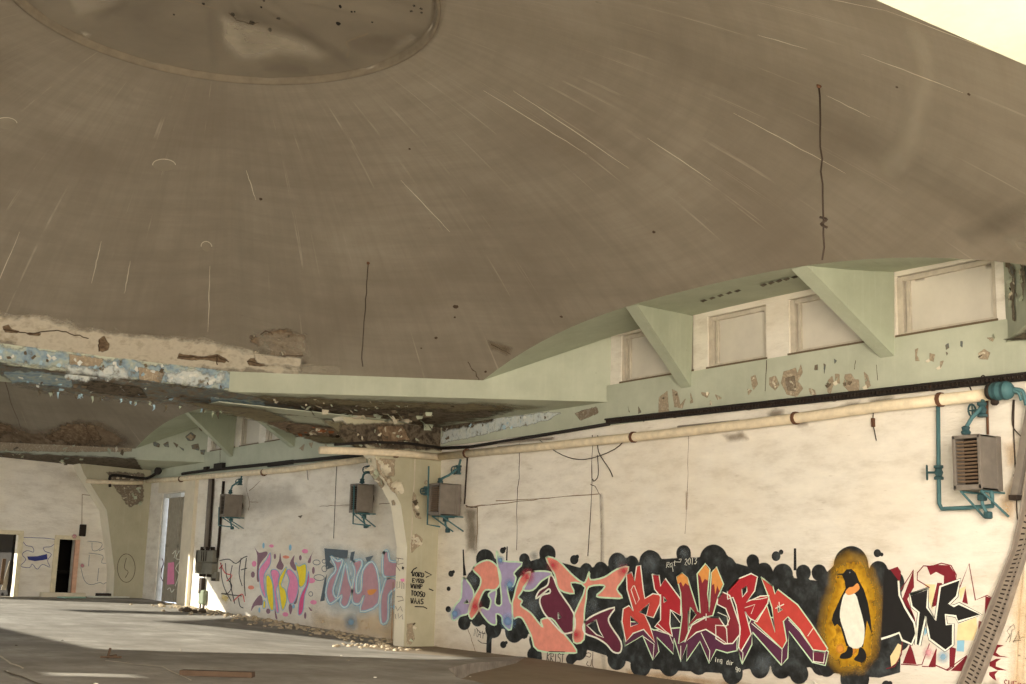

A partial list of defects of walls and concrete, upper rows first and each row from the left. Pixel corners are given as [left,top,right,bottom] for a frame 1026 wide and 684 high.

peeling [1004,263,1026,321]
peeling [915,341,963,370]
peeling [978,332,1026,360]
peeling [747,359,871,397]
peeling [0,316,560,519]
peeling [575,407,598,420]